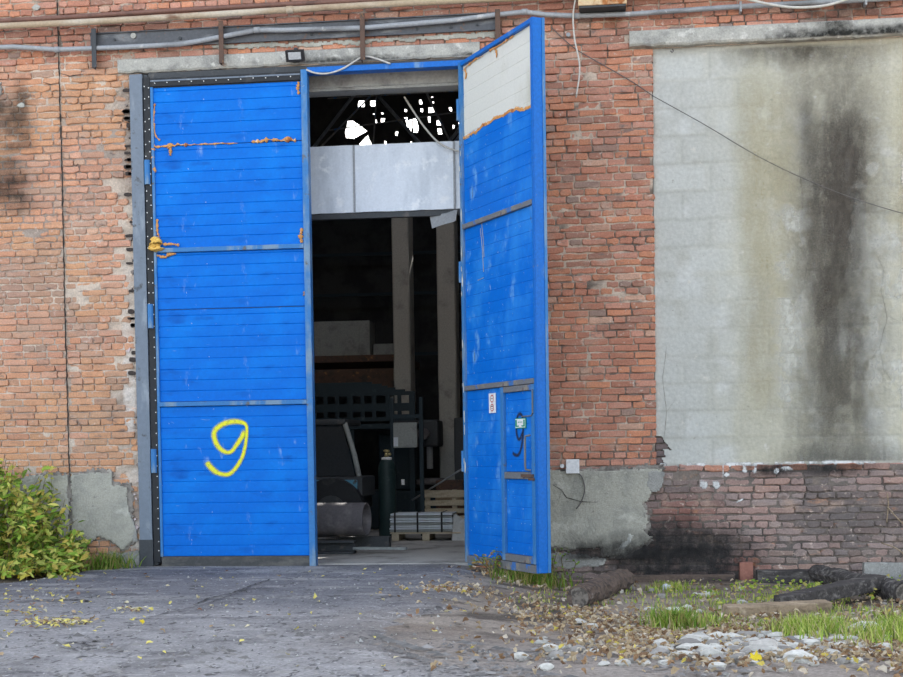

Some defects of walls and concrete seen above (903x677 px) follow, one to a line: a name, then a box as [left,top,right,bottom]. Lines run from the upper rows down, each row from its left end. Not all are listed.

spalling [121,88,131,176]
spalling [126,217,134,275]
damp [803,105,868,432]
peeling [0,468,140,566]
peeling [550,438,669,569]